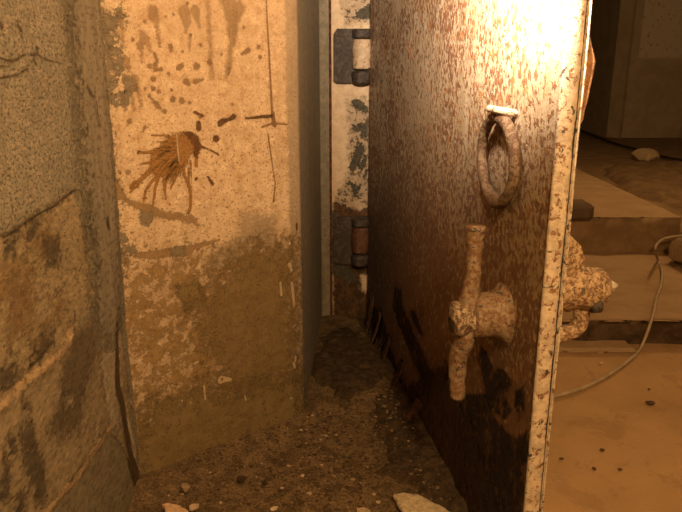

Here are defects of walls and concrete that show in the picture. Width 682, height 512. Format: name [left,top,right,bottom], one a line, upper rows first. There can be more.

crack [0,47,61,79]
damp [123,2,214,114]
damp [221,0,244,78]
peeling [341,0,370,24]
damp [116,182,199,227]
corrosion [130,111,219,214]
peeling [328,97,370,285]
damp [93,333,120,445]
crack [115,307,140,486]
damp [120,232,305,475]
damp [0,394,48,512]